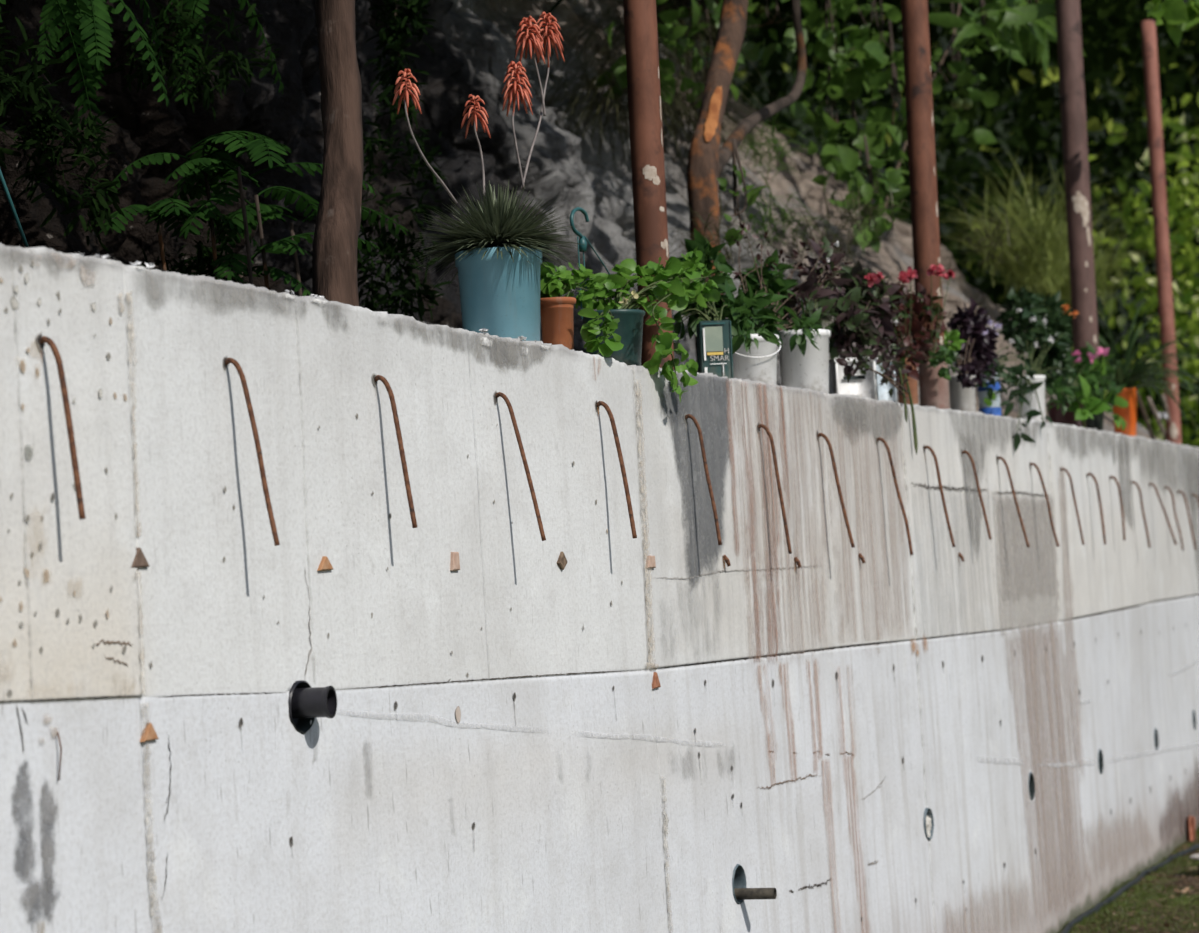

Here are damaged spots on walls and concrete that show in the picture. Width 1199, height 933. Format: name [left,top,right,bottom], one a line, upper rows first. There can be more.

water stain [661,373,729,586]
water stain [13,762,57,923]
crack [0,570,312,752]
rust [727,383,800,763]
crack [760,751,854,789]
crack [790,878,833,893]
rust [1012,482,1087,915]